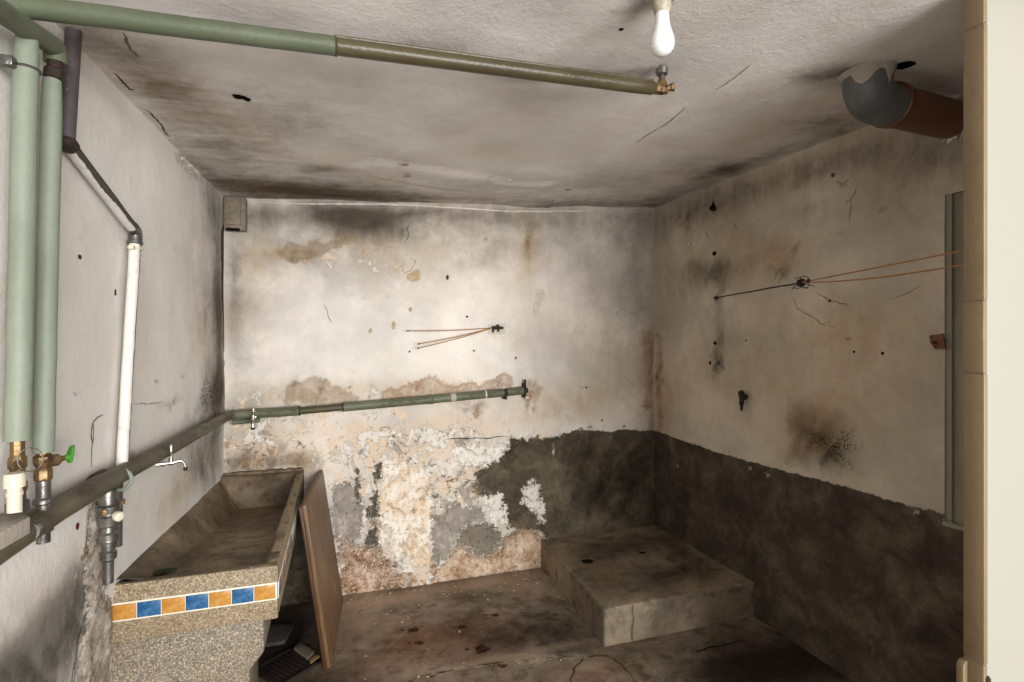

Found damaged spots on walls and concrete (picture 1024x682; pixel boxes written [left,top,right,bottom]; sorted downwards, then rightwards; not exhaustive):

crack [114,73,170,137]
crack [794,294,849,328]
peeling [329,441,549,596]